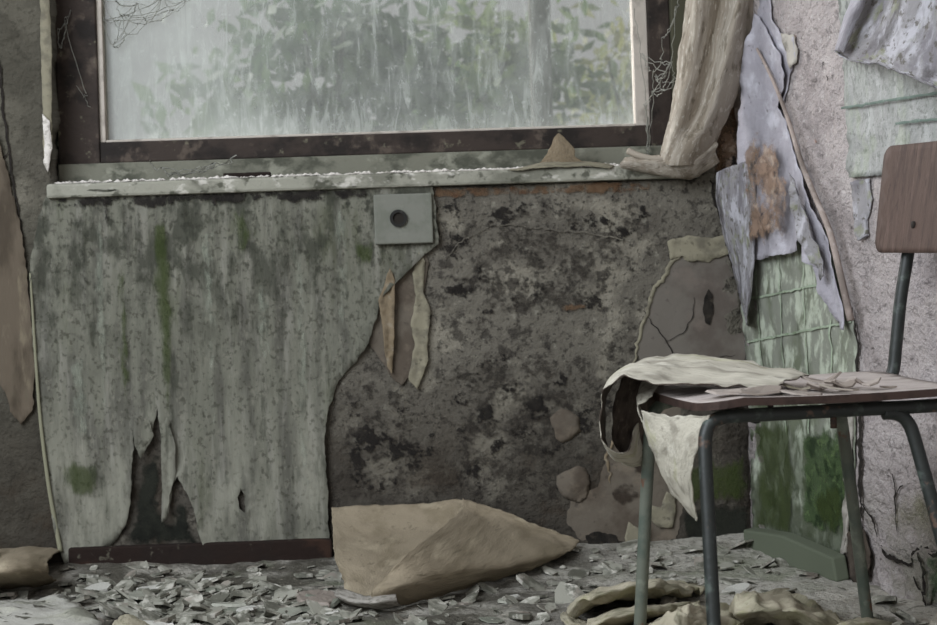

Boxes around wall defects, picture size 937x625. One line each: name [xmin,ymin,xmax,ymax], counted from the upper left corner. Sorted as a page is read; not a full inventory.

crack [0,65,23,234]
damp [58,189,367,220]
peeling [369,253,431,389]
damp [441,196,648,314]
crack [643,300,695,354]
flaking render [632,235,746,363]
crack [710,180,720,218]
peeling [737,0,855,330]
damp [454,354,616,489]
flaking render [661,407,681,417]
flaking render [567,441,642,544]
flaking render [650,461,683,542]